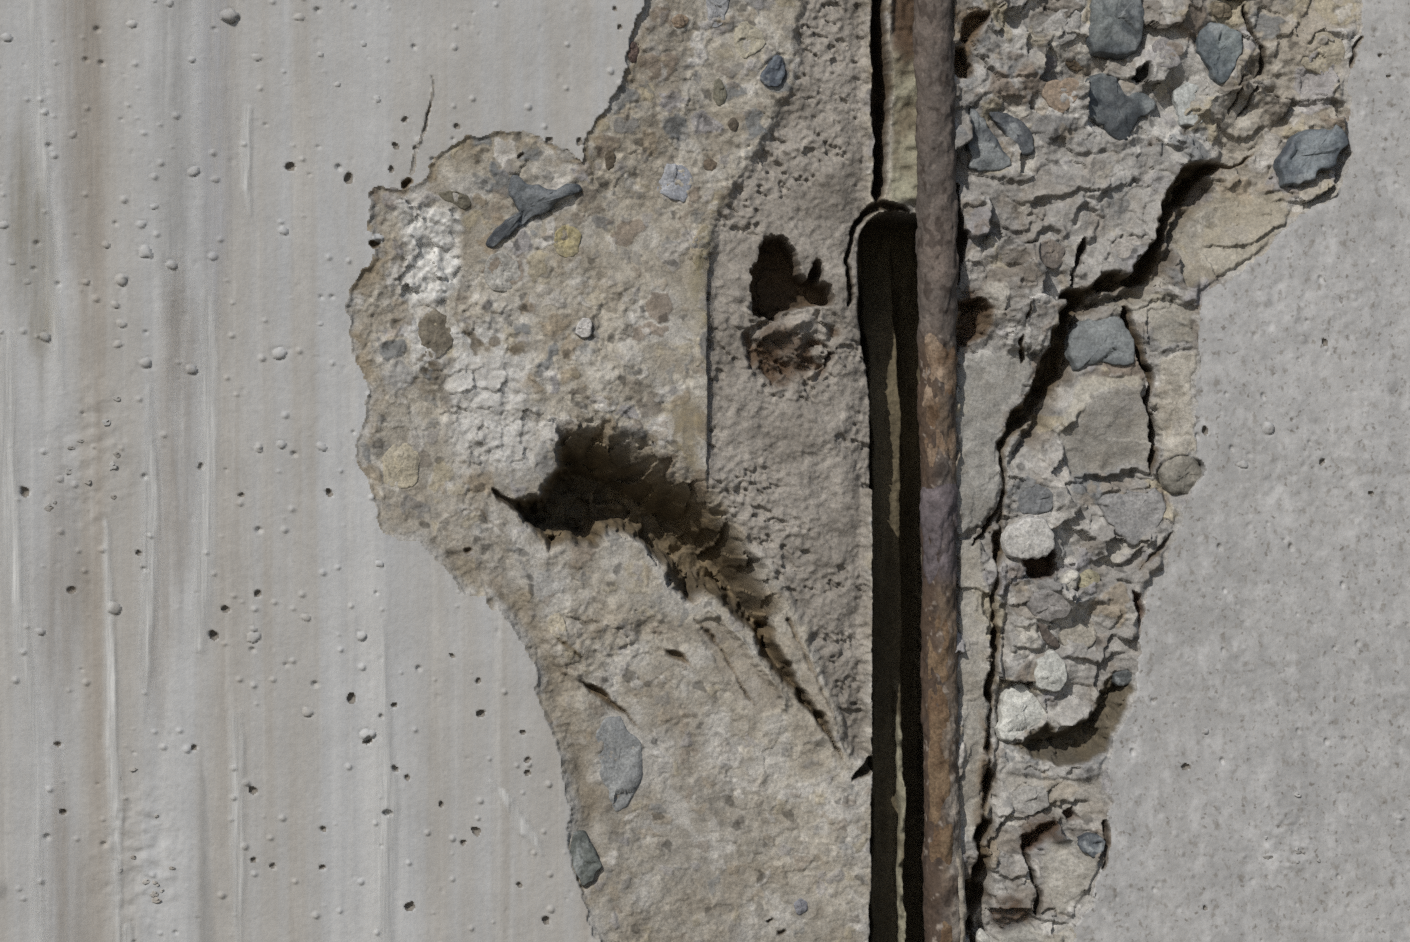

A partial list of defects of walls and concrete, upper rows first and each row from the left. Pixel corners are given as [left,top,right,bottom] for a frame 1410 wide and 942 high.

crack [843,0,911,308]
crack [1227,2,1269,120]
spalling [345,0,918,942]
rust [922,333,958,467]
crack [965,152,1254,942]
spalling [919,0,1410,942]
crack [553,636,643,731]
crack [656,616,850,769]
rust [927,614,953,865]